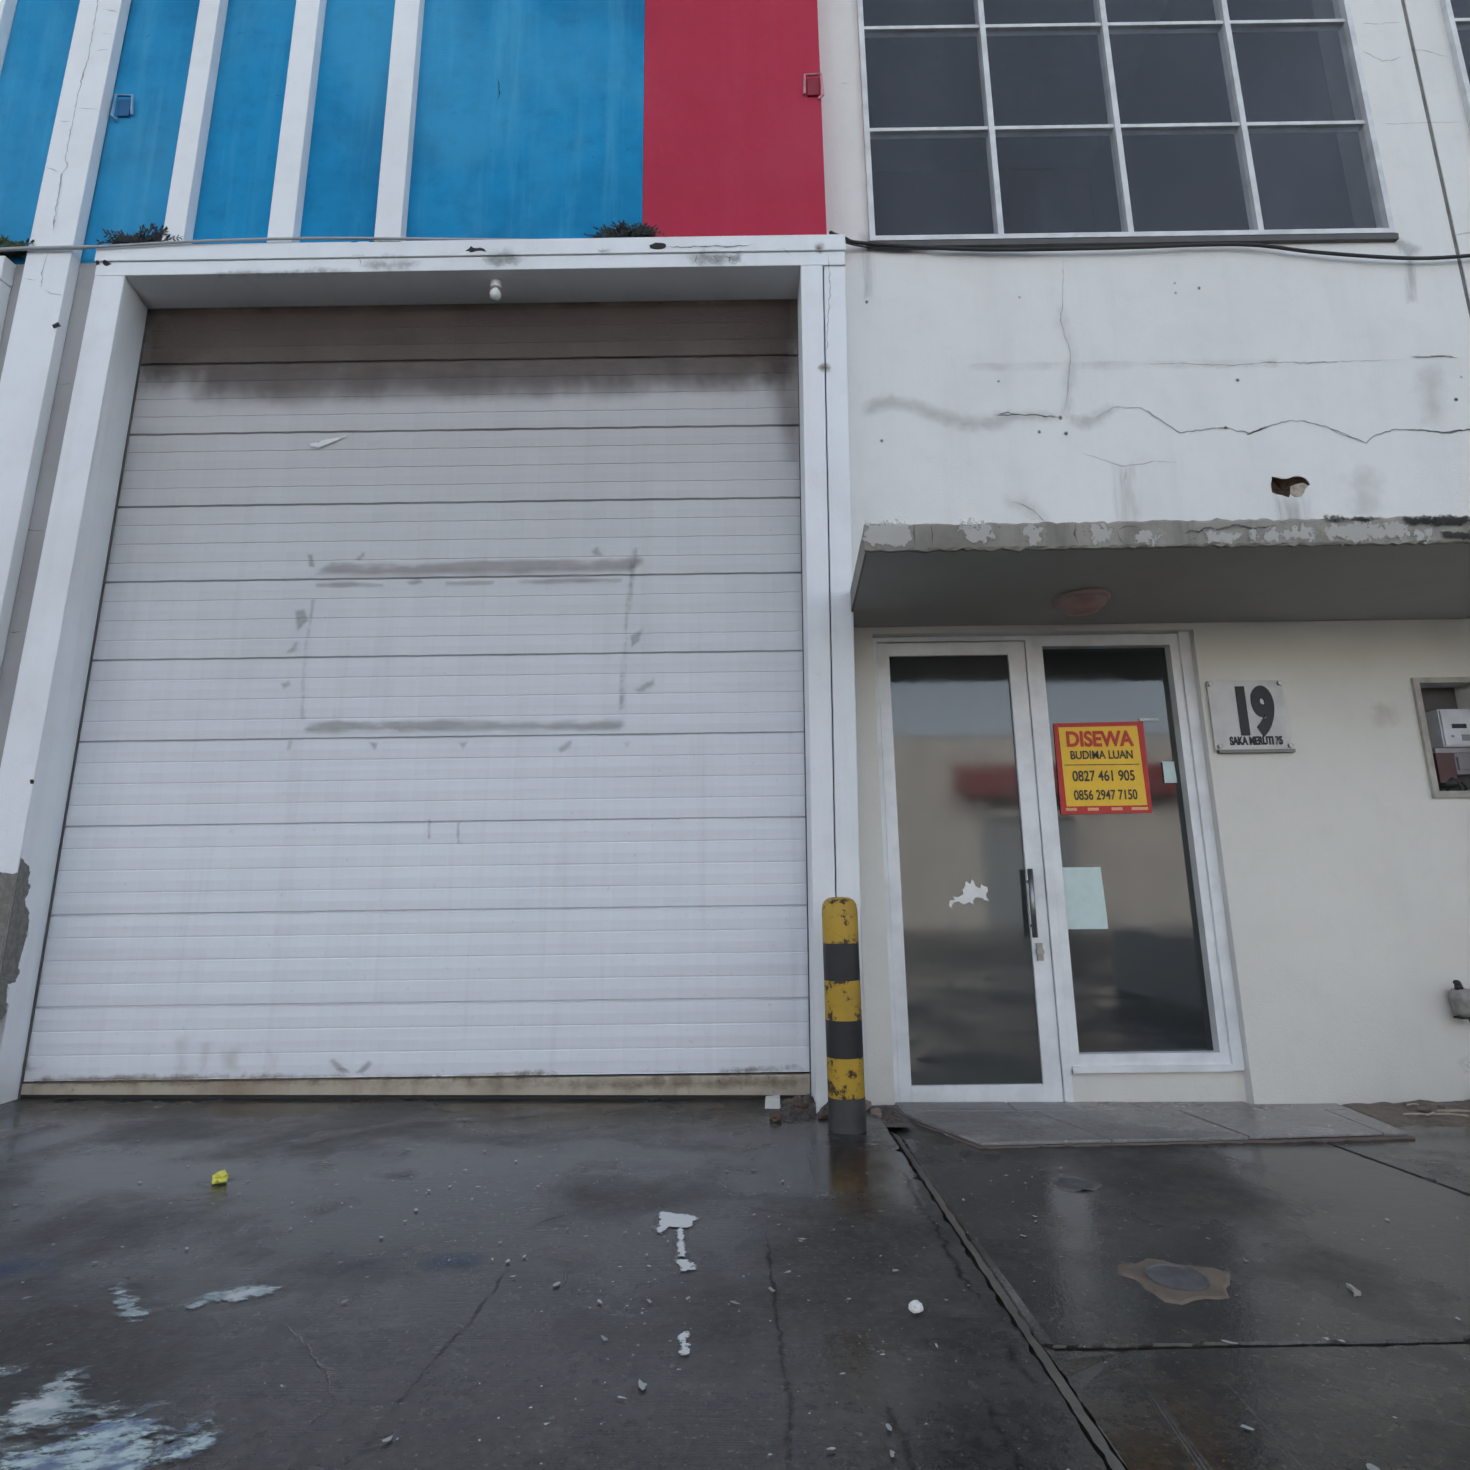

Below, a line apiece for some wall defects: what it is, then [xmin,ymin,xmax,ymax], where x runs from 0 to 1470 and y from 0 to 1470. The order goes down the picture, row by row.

crack [1134,407,1467,444]
spalling [1271,476,1309,497]
peeling [957,518,996,544]
peeling [1020,524,1044,546]
peeling [1082,522,1114,545]
peeling [1134,530,1163,547]
peeling [1205,520,1439,545]
peeling [0,859,30,1019]